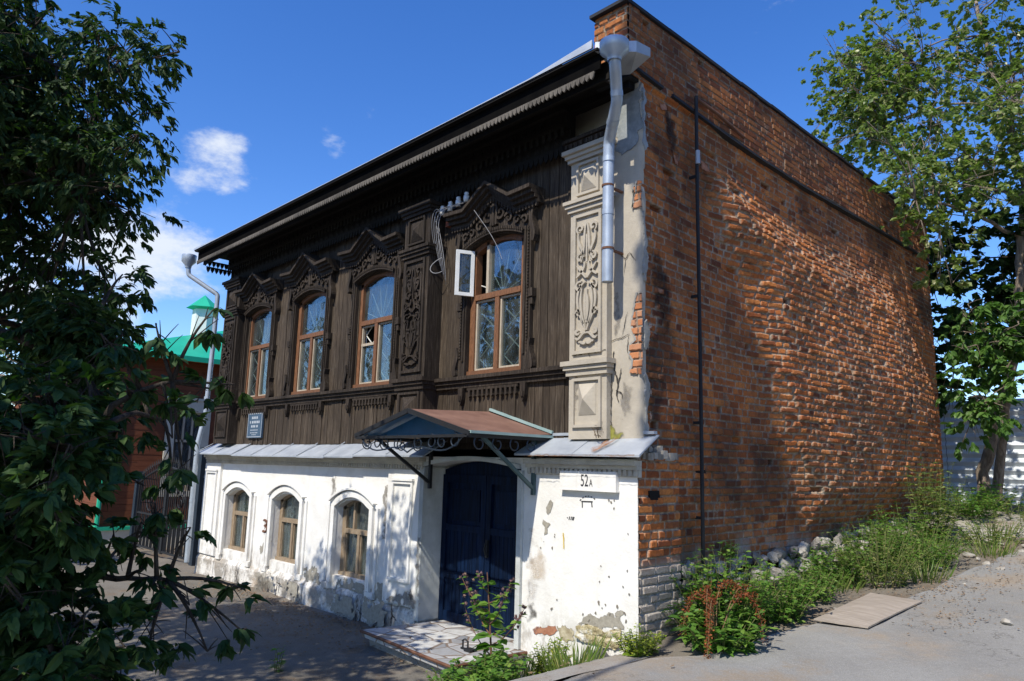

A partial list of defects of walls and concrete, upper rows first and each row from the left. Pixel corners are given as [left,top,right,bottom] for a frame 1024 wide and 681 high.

flaking render [631,180,642,210]
flaking render [628,292,643,374]
peeling [254,566,387,628]
flaking render [533,601,627,660]